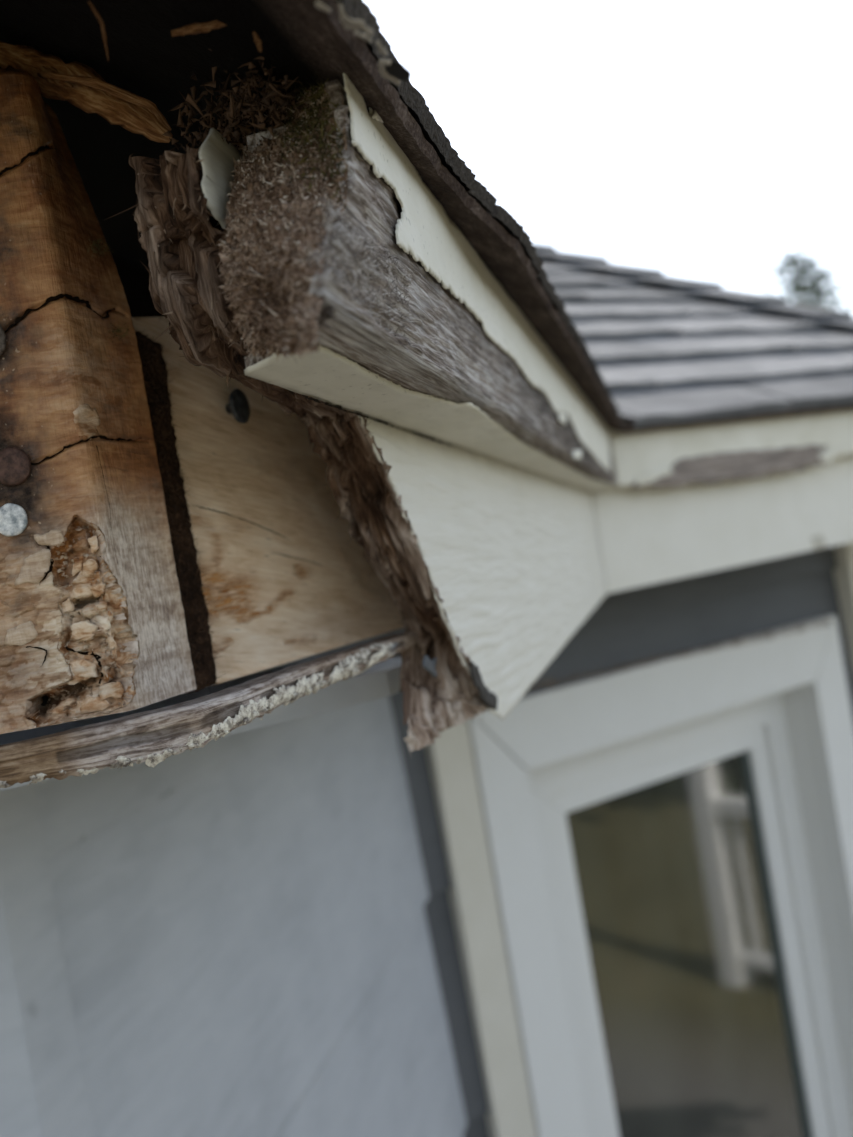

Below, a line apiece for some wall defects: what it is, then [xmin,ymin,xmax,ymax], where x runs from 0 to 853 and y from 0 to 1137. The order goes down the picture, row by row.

crack [0,145,57,176]
peeling [307,79,617,486]
crack [4,294,126,332]
peeling [244,349,273,368]
peeling [631,444,838,489]
peeling [15,529,64,586]
peeling [62,535,117,651]
peeling [5,621,38,646]
peeling [422,655,437,678]
peeling [469,661,498,711]
peeling [28,642,400,785]